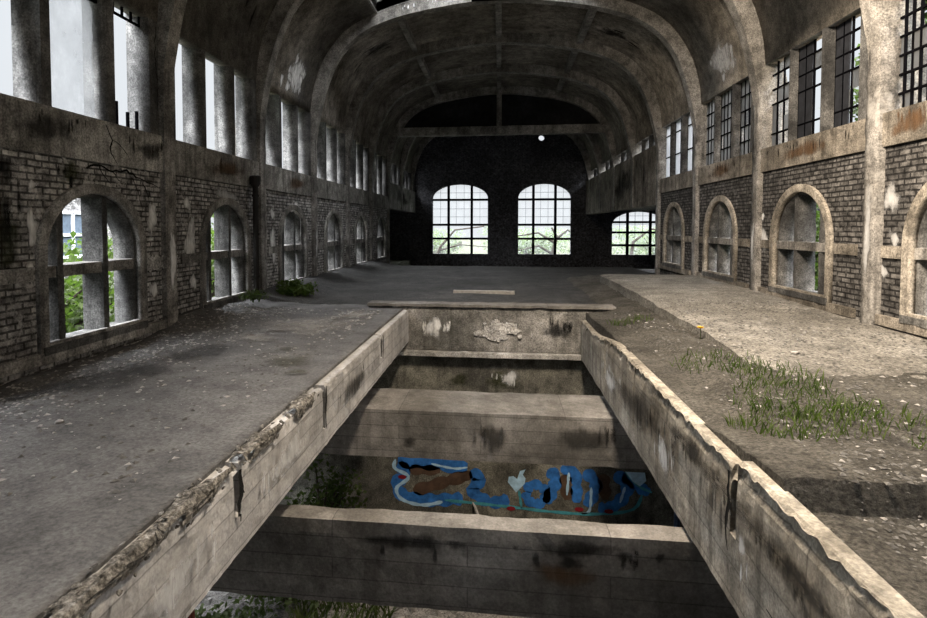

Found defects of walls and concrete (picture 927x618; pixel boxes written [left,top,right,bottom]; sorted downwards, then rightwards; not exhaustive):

leakage [473,426,504,450]
leakage [564,427,616,447]
spalling [42,387,320,618]
crack [237,469,245,522]
leakage [601,361,831,618]
leakage [367,535,437,562]
leakage [549,541,608,568]